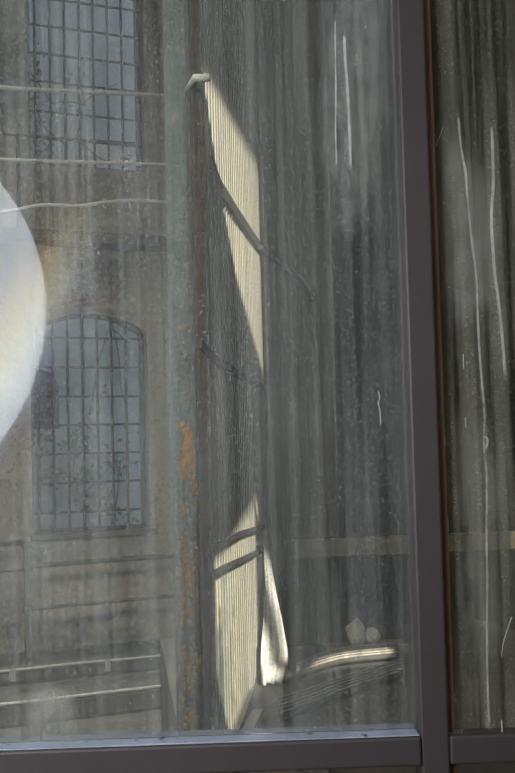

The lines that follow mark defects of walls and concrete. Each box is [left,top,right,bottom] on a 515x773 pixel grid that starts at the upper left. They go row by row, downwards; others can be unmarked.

leakage [0,631,160,666]
rust [177,533,233,731]